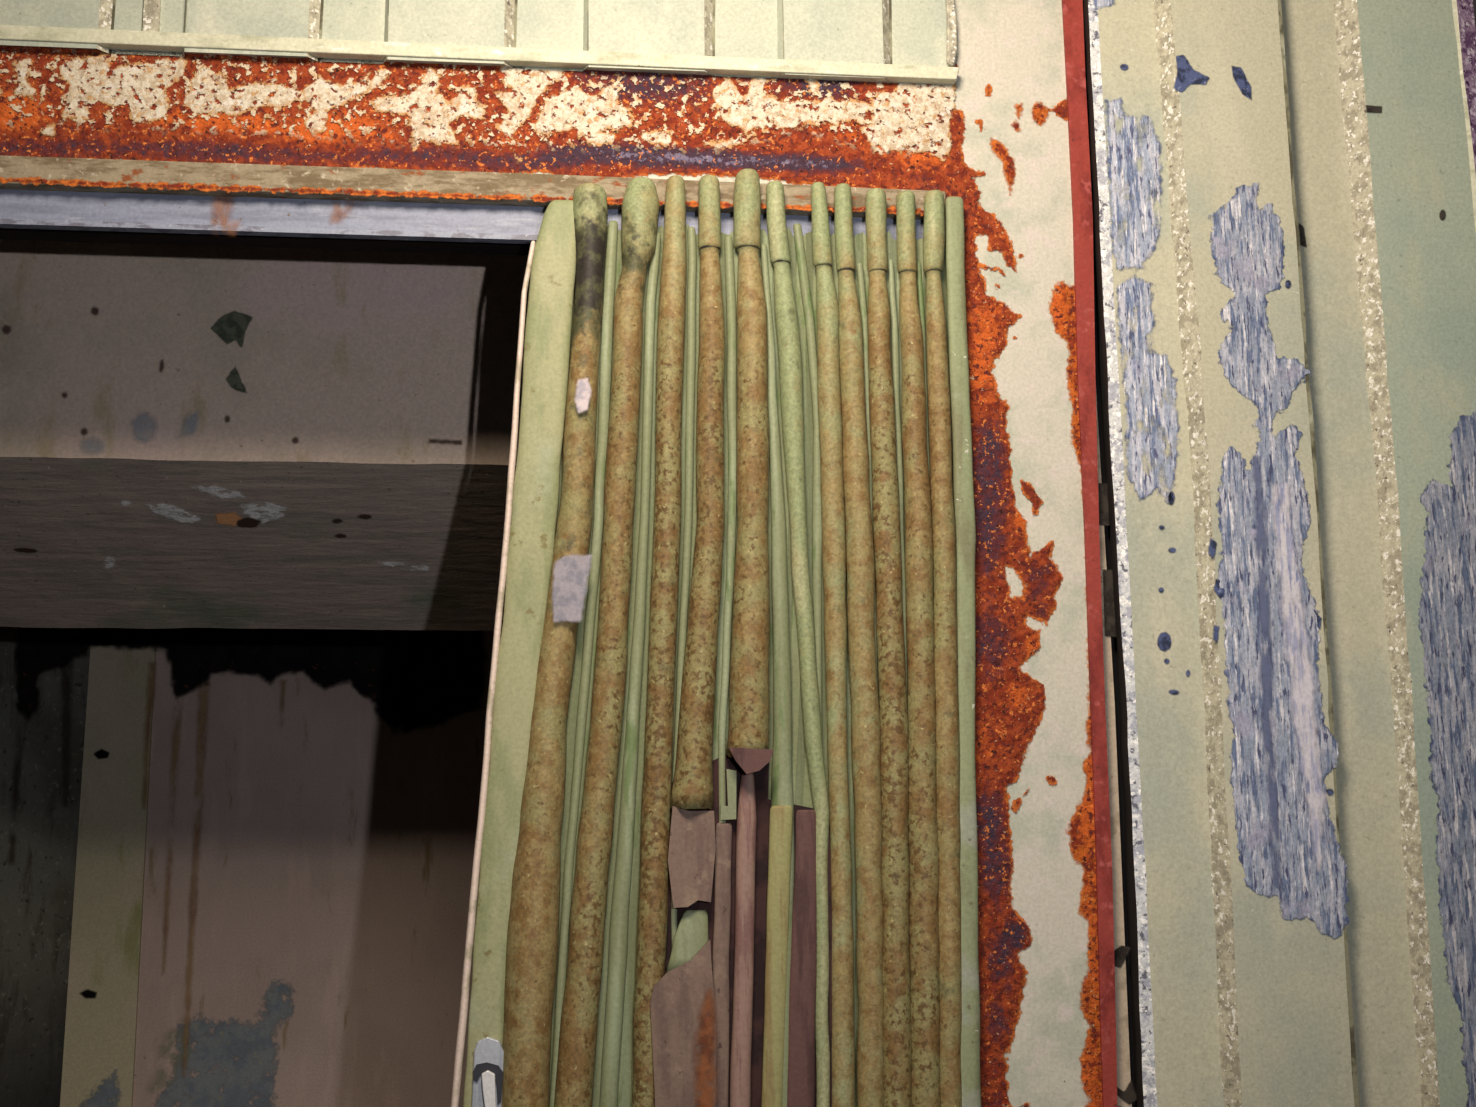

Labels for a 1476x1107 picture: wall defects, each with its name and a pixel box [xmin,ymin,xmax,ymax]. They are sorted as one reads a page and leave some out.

corrosion [0,45,1068,1107]
corrosion [1049,281,1081,472]
corrosion [1067,691,1102,1107]
peeling [1104,98,1180,505]
peeling [1157,632,1171,664]
peeling [1208,183,1350,939]
peeling [1419,411,1476,1107]